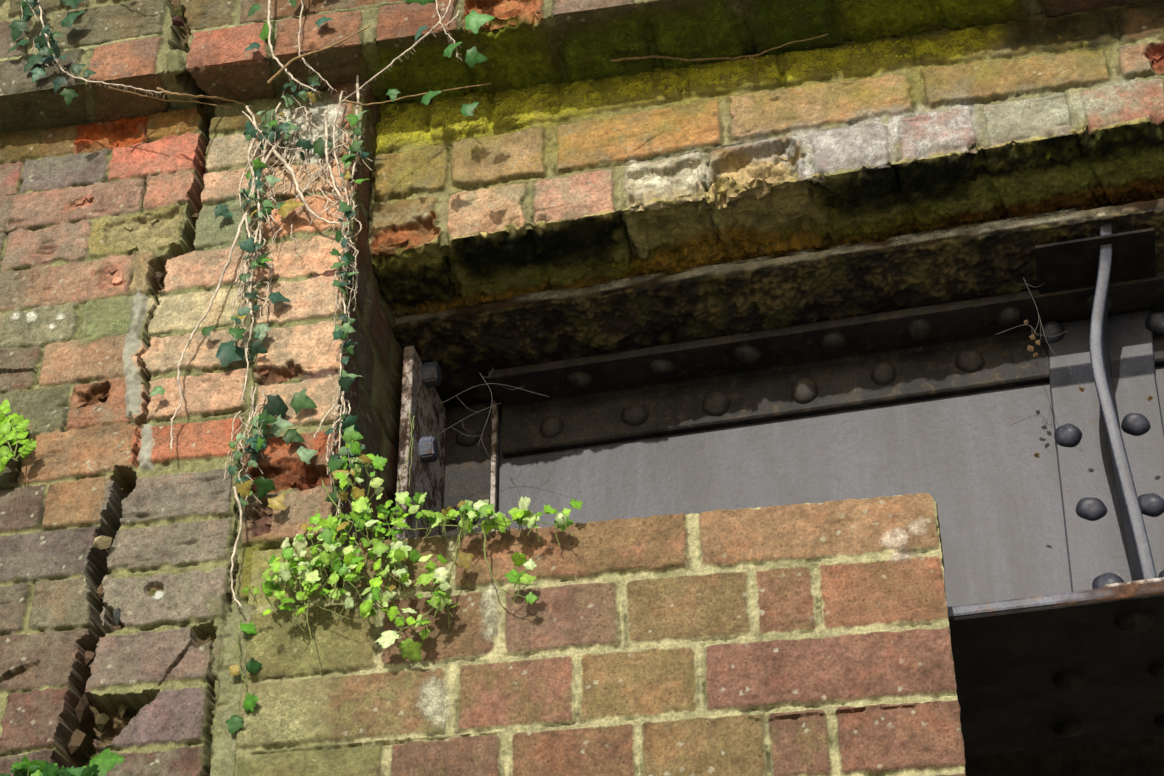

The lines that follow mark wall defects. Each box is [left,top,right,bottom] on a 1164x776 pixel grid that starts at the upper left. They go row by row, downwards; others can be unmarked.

spalling [462,0,543,34]
damp [374,0,1018,146]
damp [1012,12,1124,51]
spalling [1141,41,1164,76]
damp [377,217,621,310]
damp [627,152,711,196]
spalling [624,137,846,268]
damp [892,230,958,245]
damp [748,82,1164,215]
damp [978,219,1016,229]
crack [50,0,217,769]
spalling [242,455,336,540]